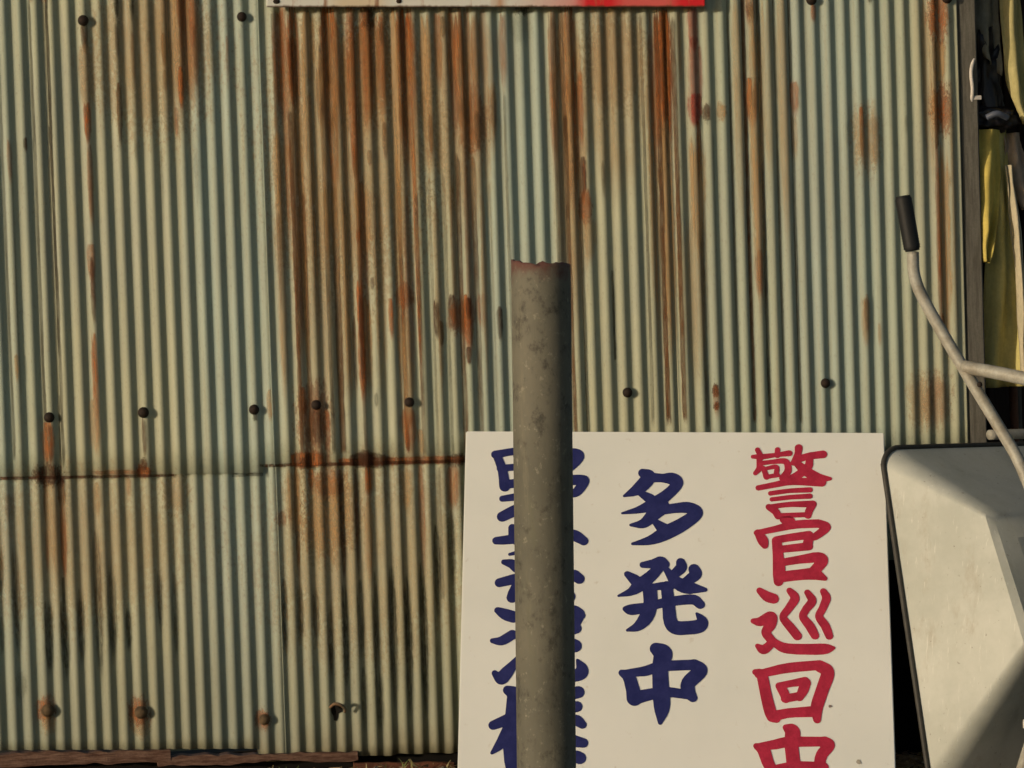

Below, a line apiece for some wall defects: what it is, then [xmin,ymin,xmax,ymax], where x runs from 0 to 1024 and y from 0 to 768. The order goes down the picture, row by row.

rust [161,0,191,105]
rust [246,7,496,573]
rust [550,7,592,432]
rust [647,10,687,421]
rust [859,107,868,151]
rust [927,0,951,329]
damp [45,600,84,669]
rust [0,423,174,611]
damp [95,533,131,660]
damp [282,590,318,648]
damp [329,589,349,660]
damp [362,522,454,701]